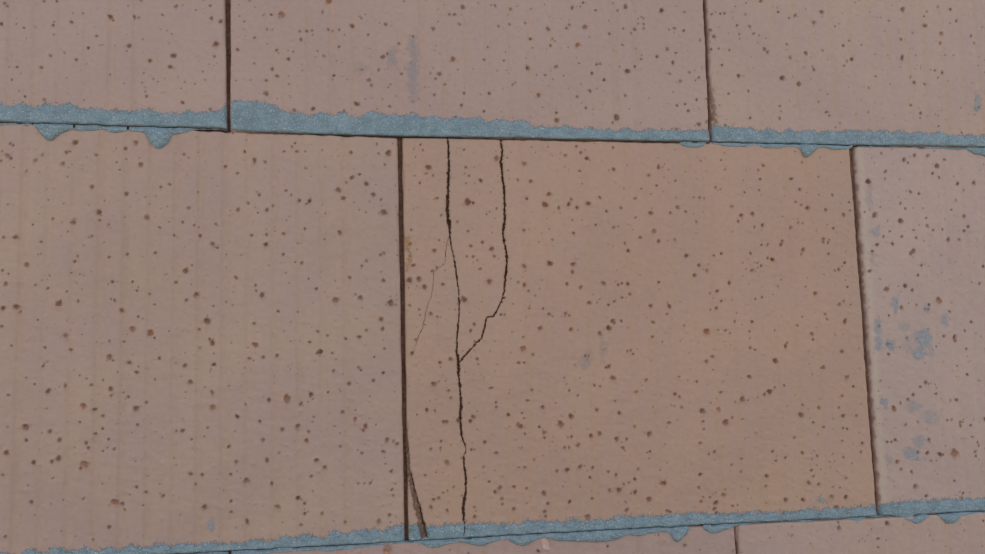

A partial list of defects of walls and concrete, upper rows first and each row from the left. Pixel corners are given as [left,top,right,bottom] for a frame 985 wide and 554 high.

crack [406,434,428,538]
crack [414,138,508,536]